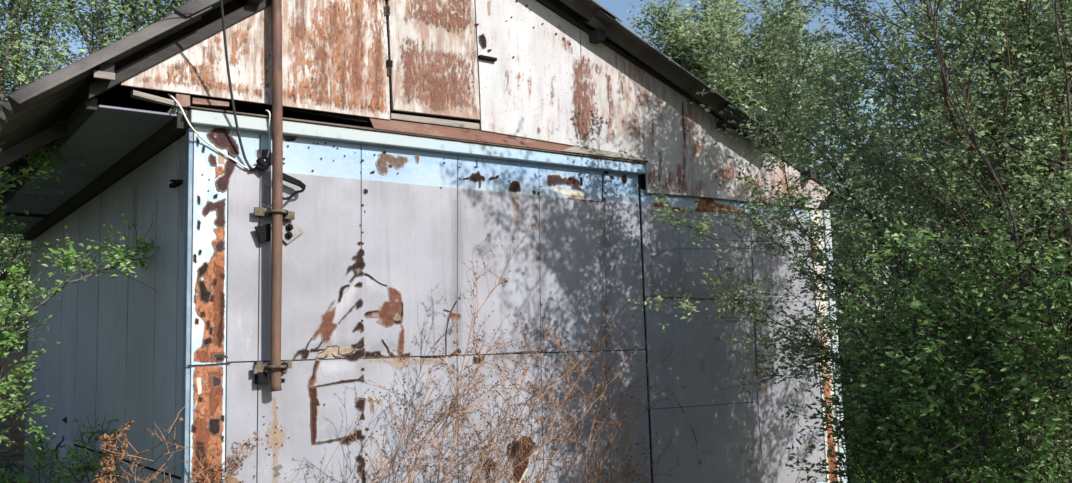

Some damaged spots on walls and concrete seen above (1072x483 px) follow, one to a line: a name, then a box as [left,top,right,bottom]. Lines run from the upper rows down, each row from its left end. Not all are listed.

corrosion [121,0,662,147]
peeling [463,160,637,202]
corrosion [553,188,599,202]
corrosion [647,102,703,193]
corrosion [653,197,741,214]
corrosion [192,227,289,483]
peeling [292,224,461,445]